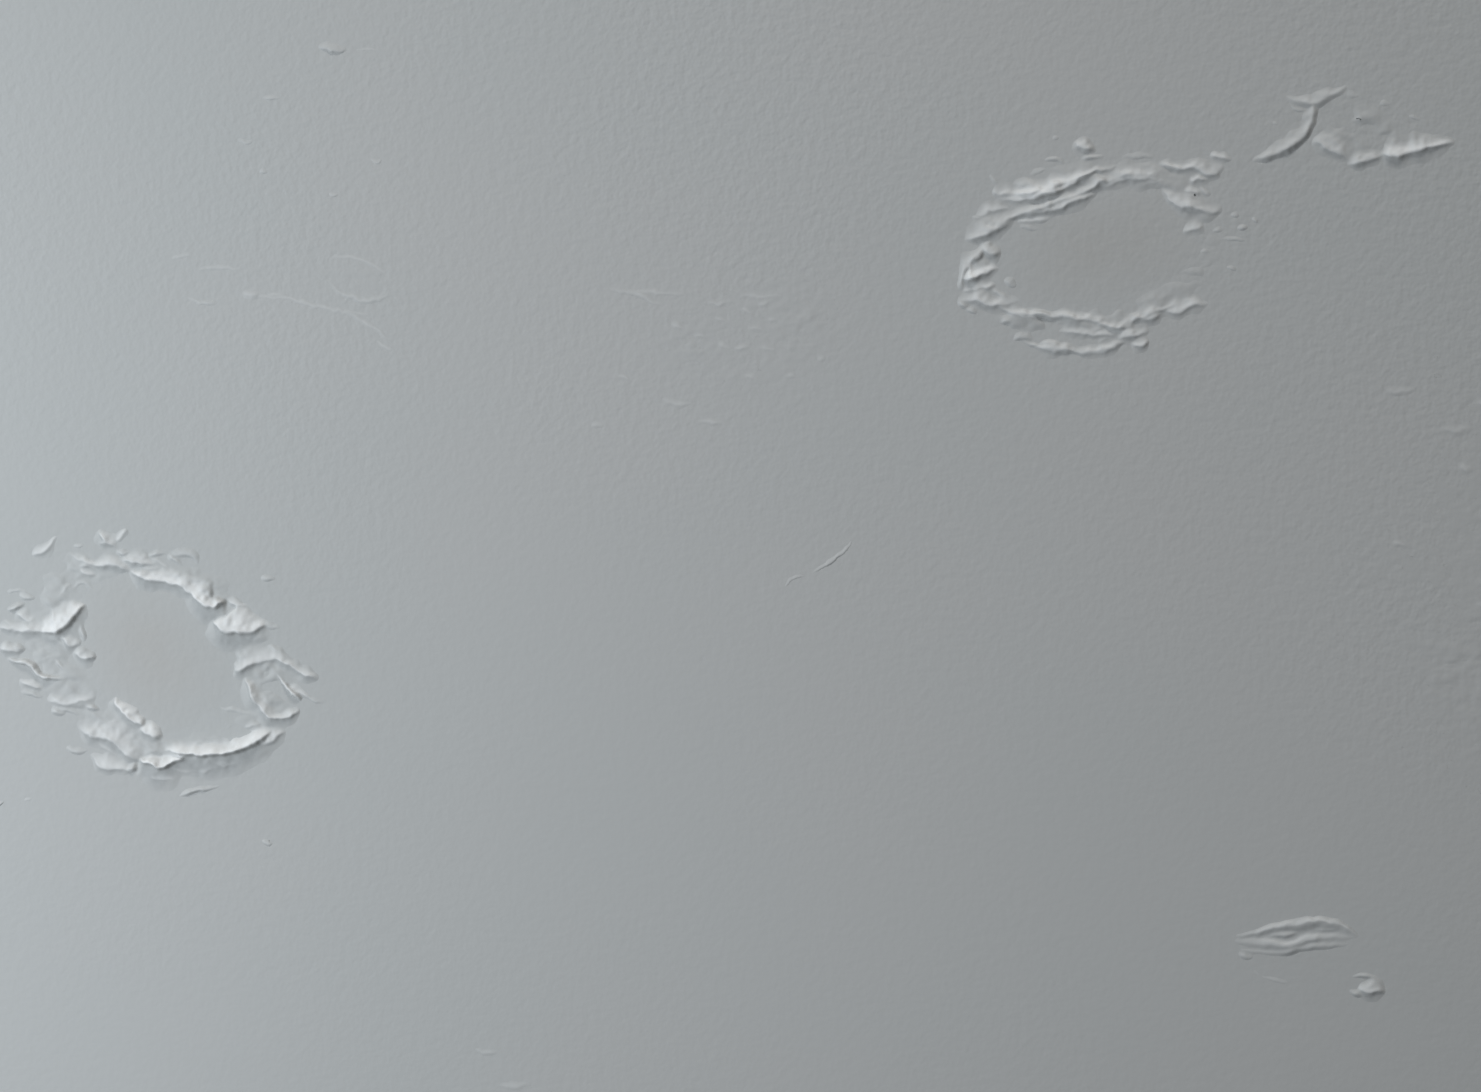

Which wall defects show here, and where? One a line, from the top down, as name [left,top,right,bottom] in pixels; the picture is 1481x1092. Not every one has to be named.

peeling [957,135,1258,359]
peeling [0,528,324,797]